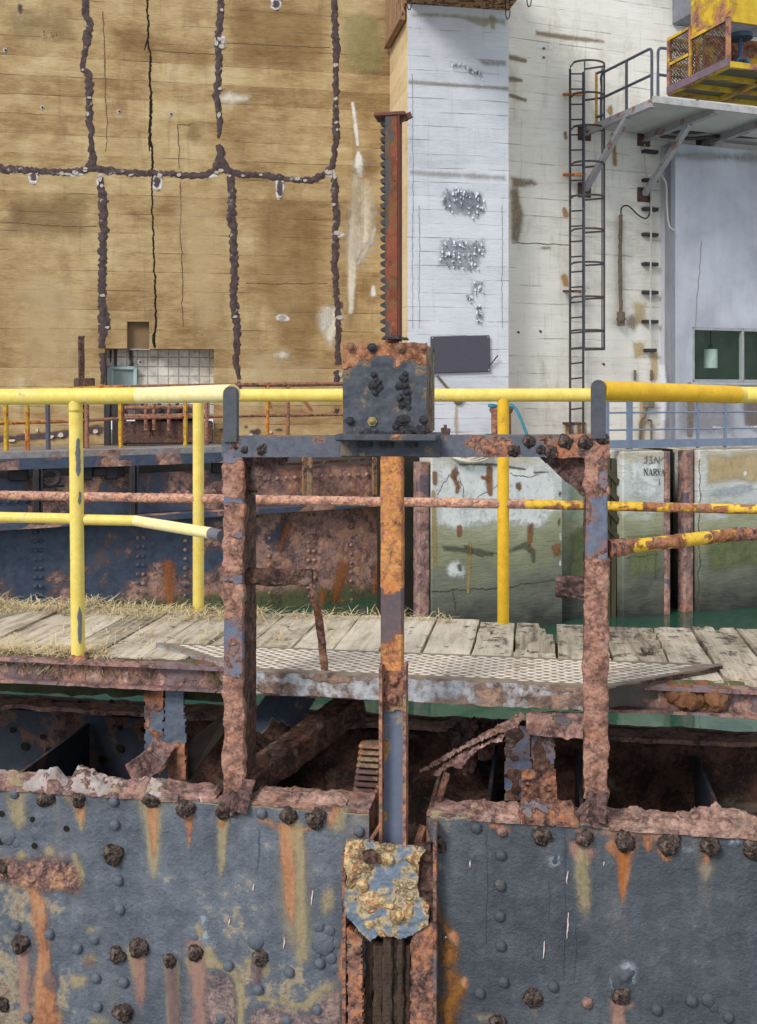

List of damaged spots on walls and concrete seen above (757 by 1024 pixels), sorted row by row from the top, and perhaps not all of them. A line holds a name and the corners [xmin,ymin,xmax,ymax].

crack [0,0,344,389]
leakage [348,102,376,314]
peeling [442,187,485,219]
leakage [460,463,545,473]
leakage [443,546,493,556]
leakage [512,542,535,562]
corrosion [0,848,83,1024]
corrosion [0,764,224,872]
corrosion [263,819,308,963]
corrosion [252,786,350,829]
corrosion [415,840,467,1024]
corrosion [604,802,757,898]